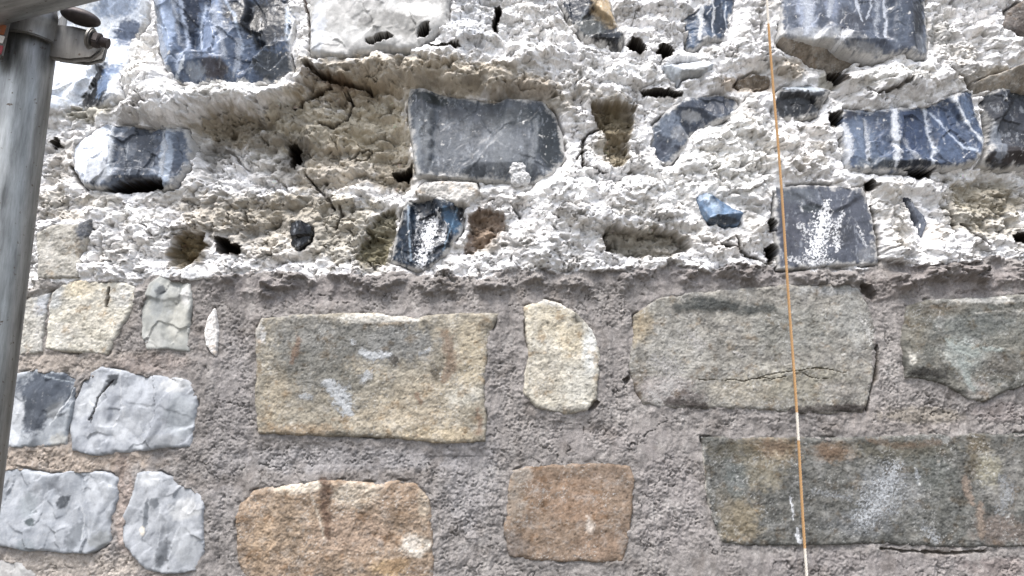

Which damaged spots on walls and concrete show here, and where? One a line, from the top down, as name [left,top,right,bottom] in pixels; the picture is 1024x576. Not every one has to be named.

crack [288,0,374,130]
crack [699,367,847,382]